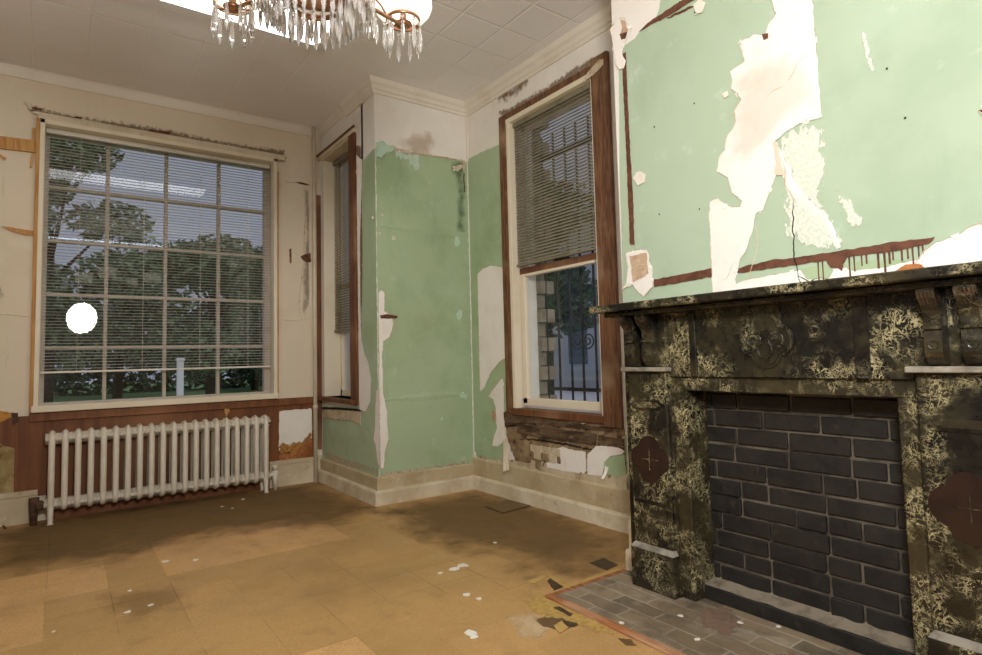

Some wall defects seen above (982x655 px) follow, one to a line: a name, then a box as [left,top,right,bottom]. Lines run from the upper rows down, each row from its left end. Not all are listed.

peeling [693,0,706,15]
peeling [708,0,982,292]
peeling [308,155,398,469]
peeling [477,266,505,393]
flaking render [622,249,654,297]
flaking render [491,410,628,488]